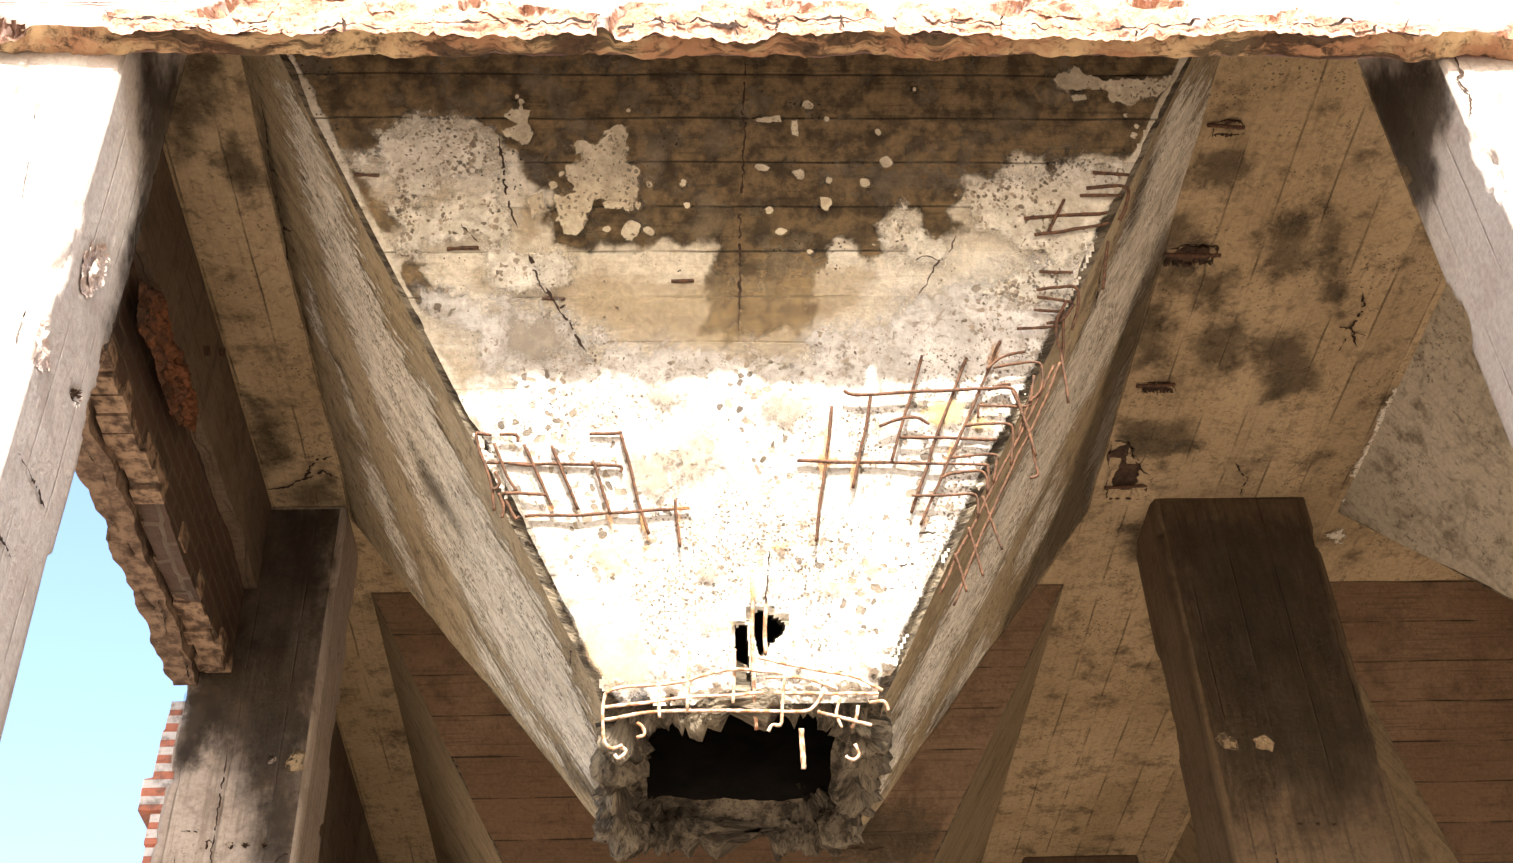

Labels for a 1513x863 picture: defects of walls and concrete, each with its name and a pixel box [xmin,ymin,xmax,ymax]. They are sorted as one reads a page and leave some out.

spalling [102,0,1442,44]
peeling [1054,65,1172,139]
crack [1454,57,1473,114]
peeling [526,108,655,241]
crack [0,1,1442,352]
water stain [1197,326,1315,400]
water stain [211,53,1248,863]
corrosion [815,426,874,483]
corrosion [921,401,994,430]
water stain [1342,388,1398,503]
corrosion [582,620,649,682]
spalling [642,570,909,730]